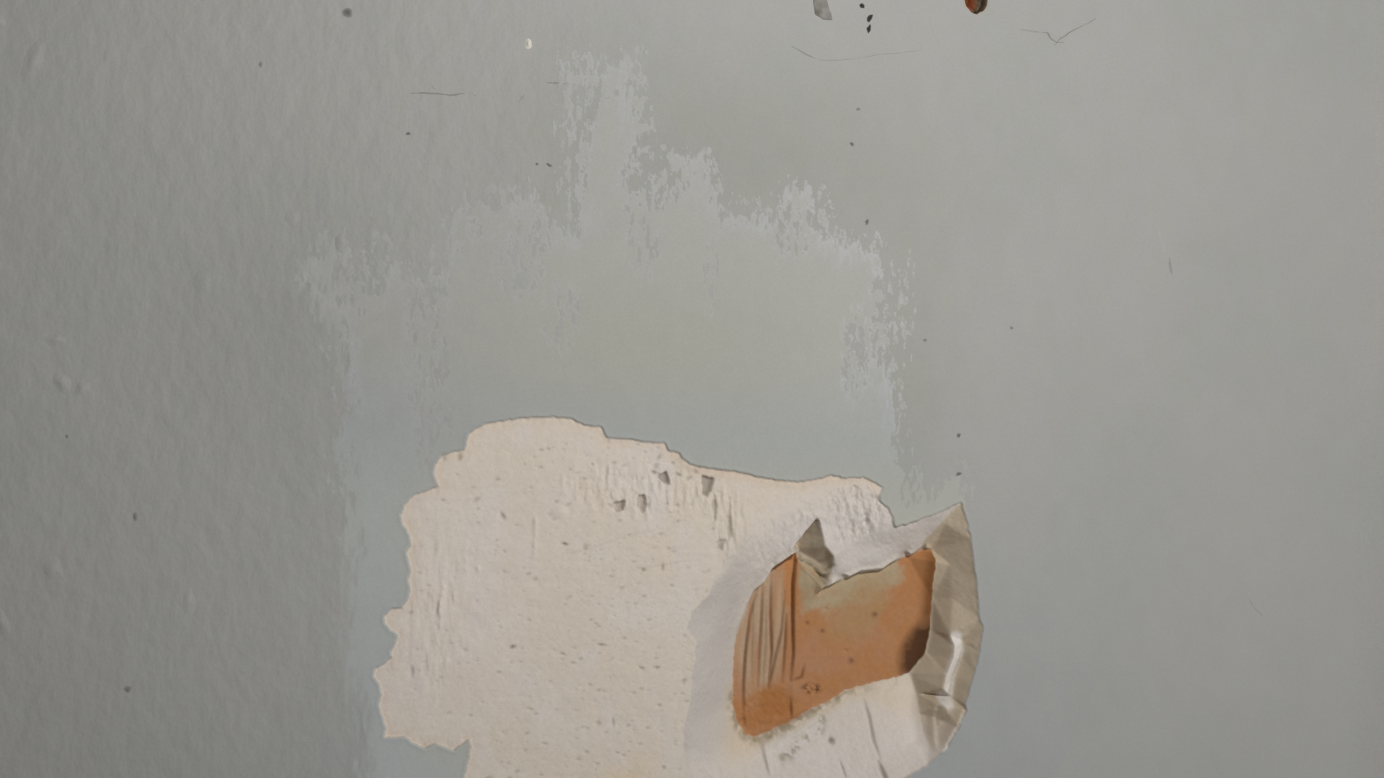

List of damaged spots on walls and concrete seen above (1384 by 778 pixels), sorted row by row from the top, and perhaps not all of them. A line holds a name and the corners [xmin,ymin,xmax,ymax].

peeling [373,417,983,778]